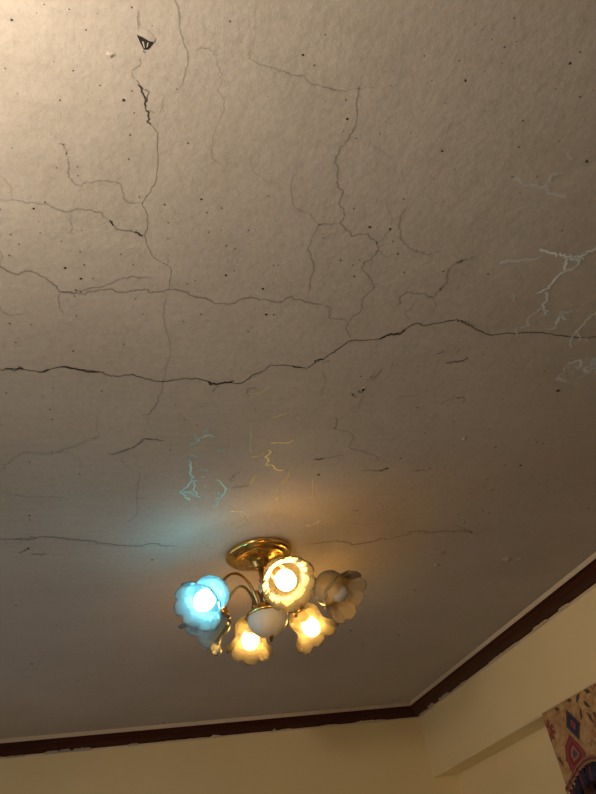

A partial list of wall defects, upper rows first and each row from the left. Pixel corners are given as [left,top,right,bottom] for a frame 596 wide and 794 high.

peeling [136,12,155,53]
crack [138,85,150,123]
water stain [537,246,596,316]
crack [0,319,596,391]